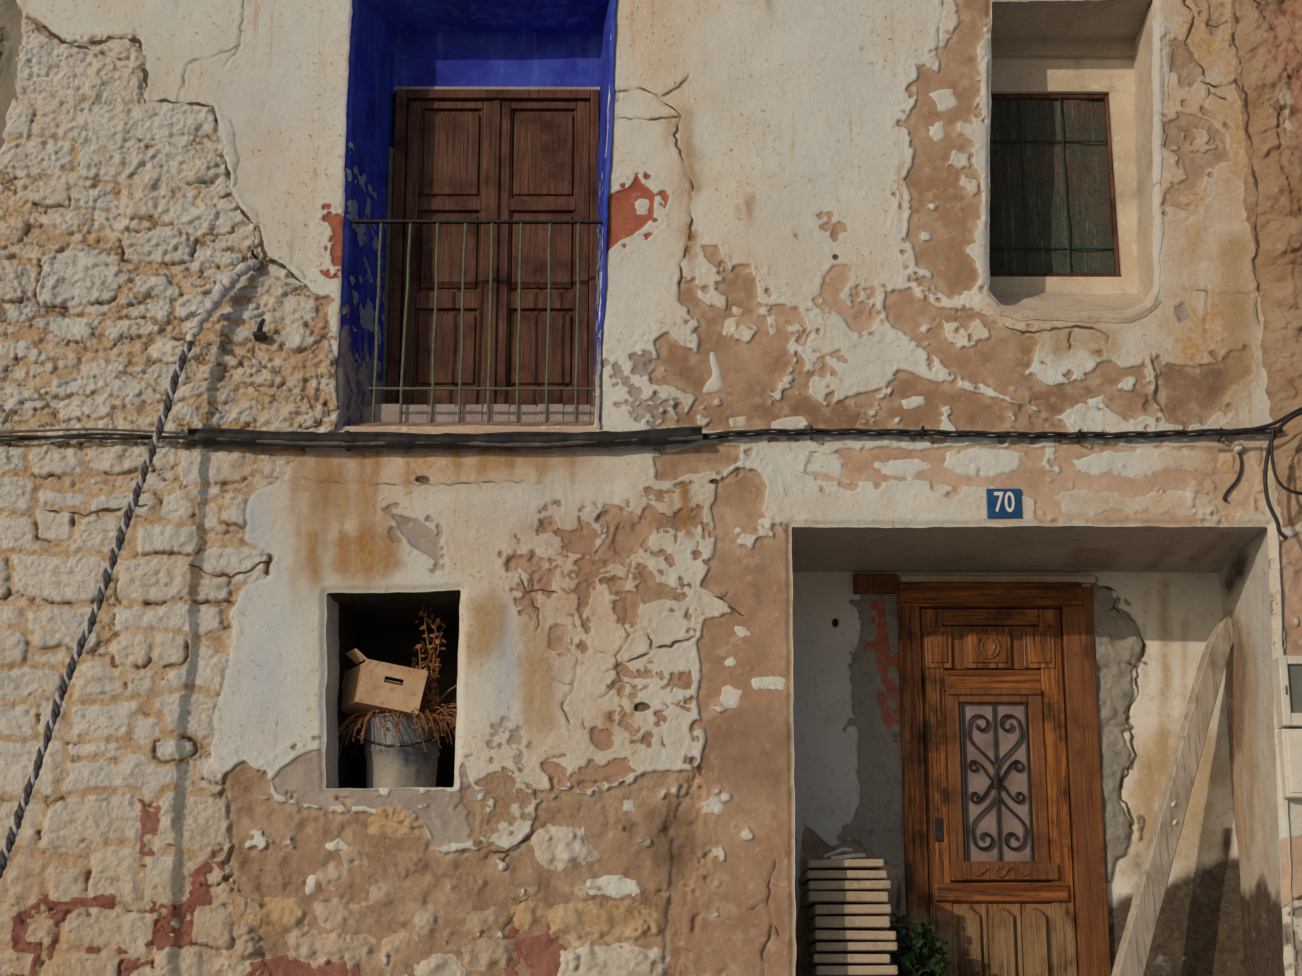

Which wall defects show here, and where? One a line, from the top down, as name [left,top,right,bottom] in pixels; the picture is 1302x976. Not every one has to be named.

crack [33,0,326,300]
crack [615,74,694,287]
flaking render [601,0,1272,526]
crack [1183,0,1261,339]
flaking render [0,6,905,976]
water stain [1194,536,1245,592]
flaking render [1090,578,1146,883]
water stain [1180,622,1245,856]
water stain [1108,896,1133,975]
water stain [1144,829,1289,976]